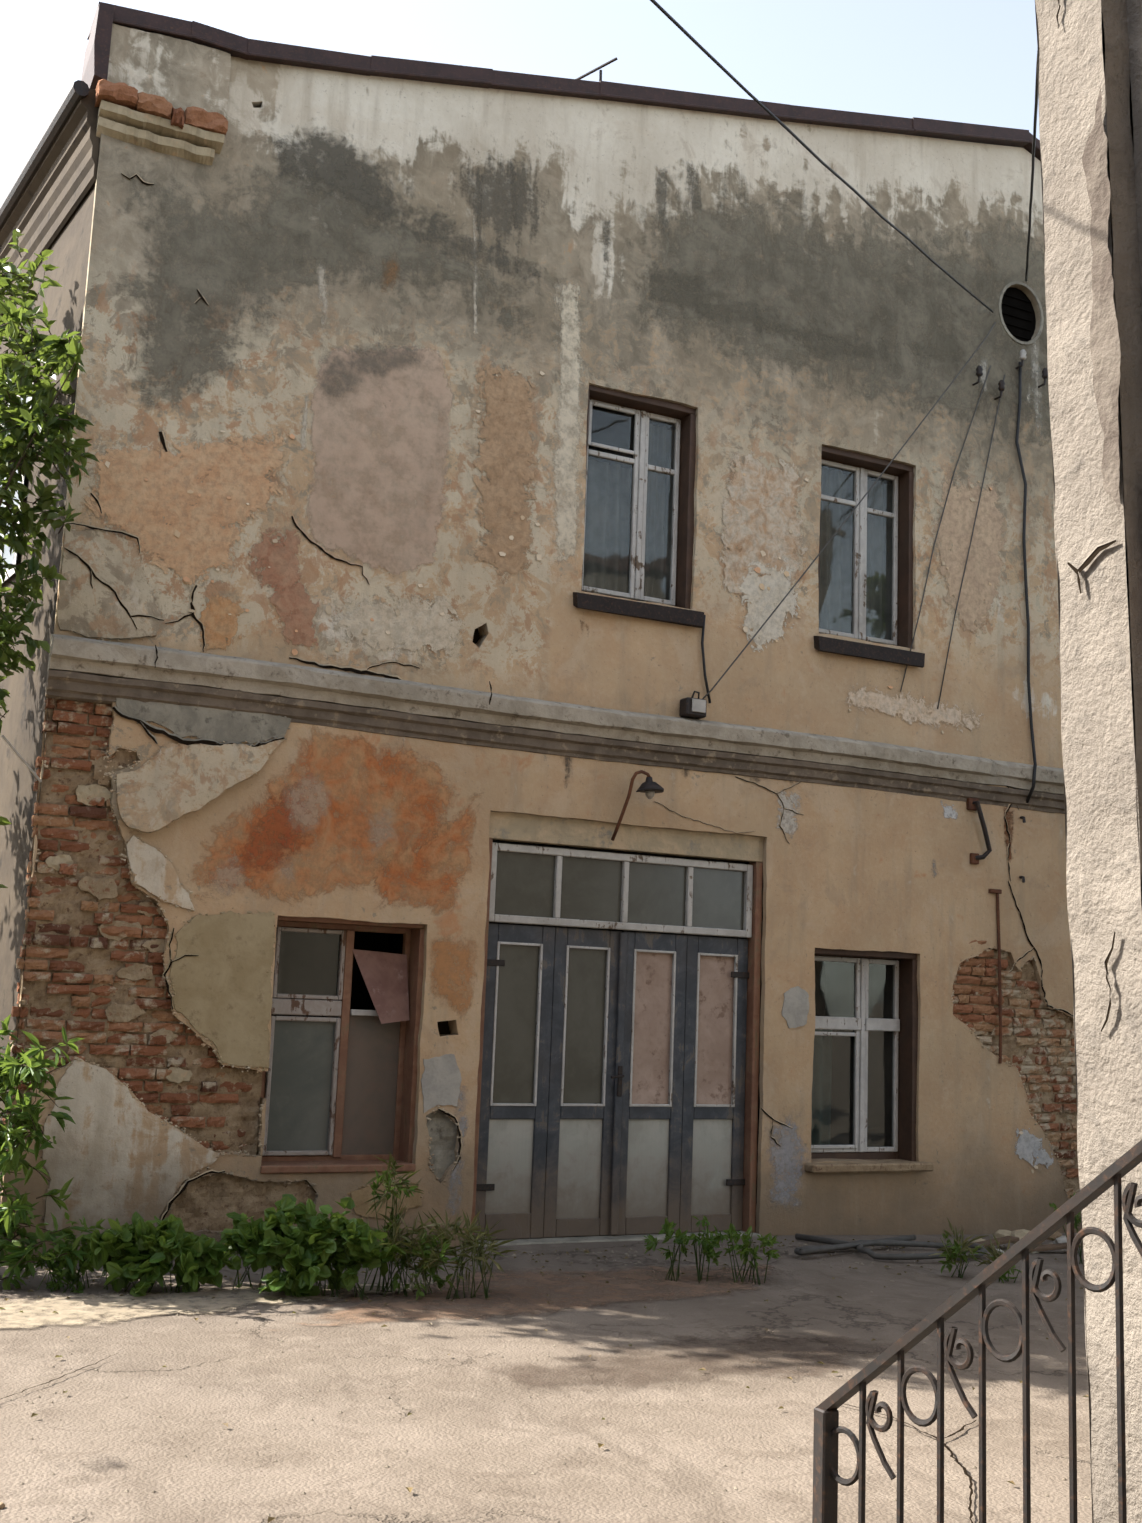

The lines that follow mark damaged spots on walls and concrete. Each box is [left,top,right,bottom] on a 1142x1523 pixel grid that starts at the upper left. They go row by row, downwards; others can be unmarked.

damp [118,133,540,407]
damp [640,165,1051,446]
crack [64,493,206,667]
peeling [82,429,480,661]
crack [291,516,370,585]
damp [301,345,453,574]
peeling [472,360,545,584]
damp [552,284,581,561]
peeling [717,450,809,652]
peeling [846,685,984,736]
spalling [2,697,319,1235]
spalling [951,940,1079,1200]